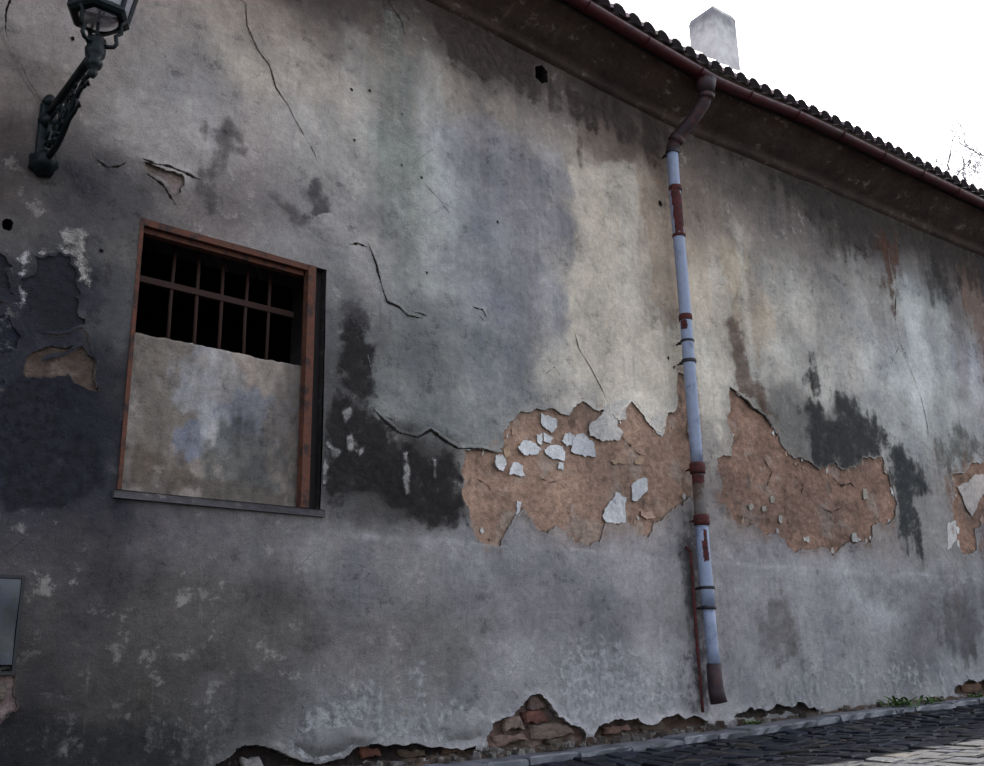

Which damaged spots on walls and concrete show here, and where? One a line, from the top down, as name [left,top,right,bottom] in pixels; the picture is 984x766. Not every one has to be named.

crack [0,0,42,104]
crack [242,0,318,163]
peeling [0,208,112,404]
crack [349,239,427,318]
peeling [323,435,364,484]
peeling [455,356,693,556]
peeling [697,378,901,564]
peeling [946,453,984,564]
spalling [0,657,32,745]
spalling [196,684,828,766]
spalling [947,670,984,700]